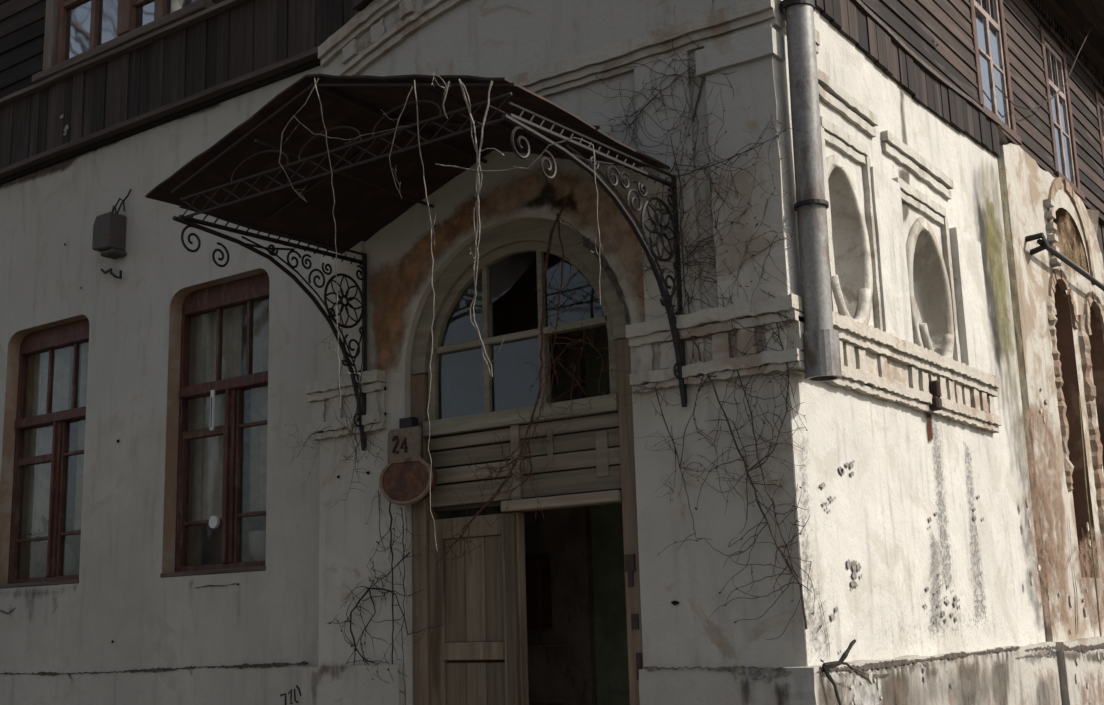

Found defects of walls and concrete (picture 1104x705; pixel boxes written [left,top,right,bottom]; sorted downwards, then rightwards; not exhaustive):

peeling [371,169,645,371]
water stain [982,165,1029,462]
spalling [1025,388,1104,634]
peeling [847,559,862,590]
crack [0,661,309,684]
peeling [849,672,882,705]
water stain [820,652,1009,705]
spalling [1066,651,1104,705]